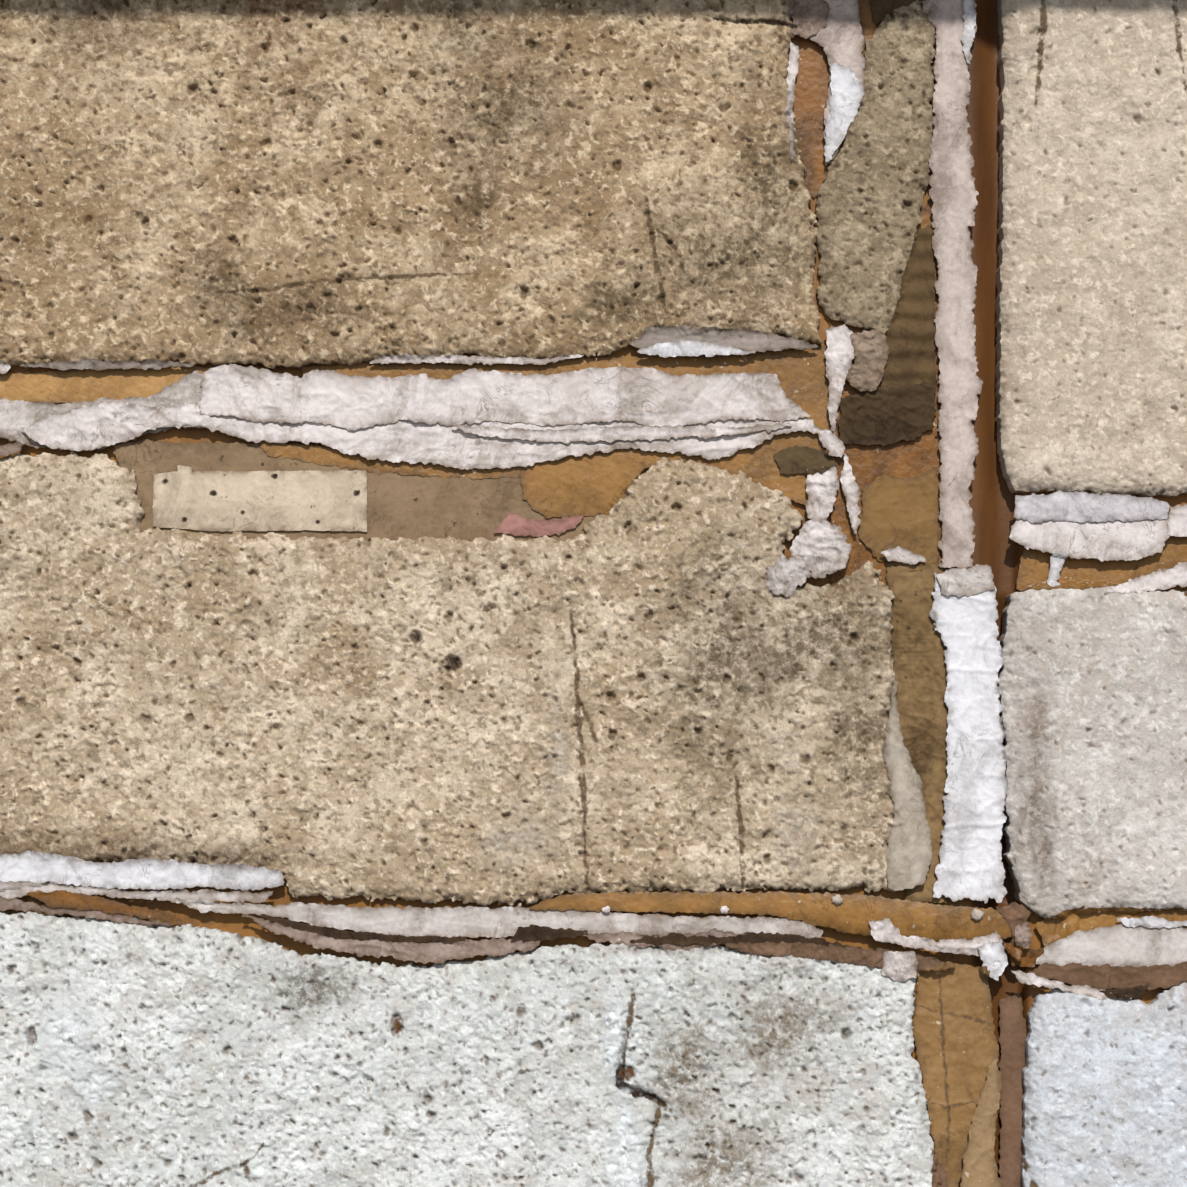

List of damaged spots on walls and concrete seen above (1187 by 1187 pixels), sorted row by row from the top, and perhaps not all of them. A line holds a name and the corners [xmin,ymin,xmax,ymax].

peeling [785,0,865,165]
crack [1035,0,1047,105]
crack [1172,0,1187,91]
peeling [0,324,889,597]
peeling [881,0,1008,903]
peeling [1009,490,1187,587]
peeling [1104,562,1187,596]
crack [570,613,598,890]
peeling [0,850,1187,1000]
crack [615,989,667,1187]
crack [190,1143,264,1187]